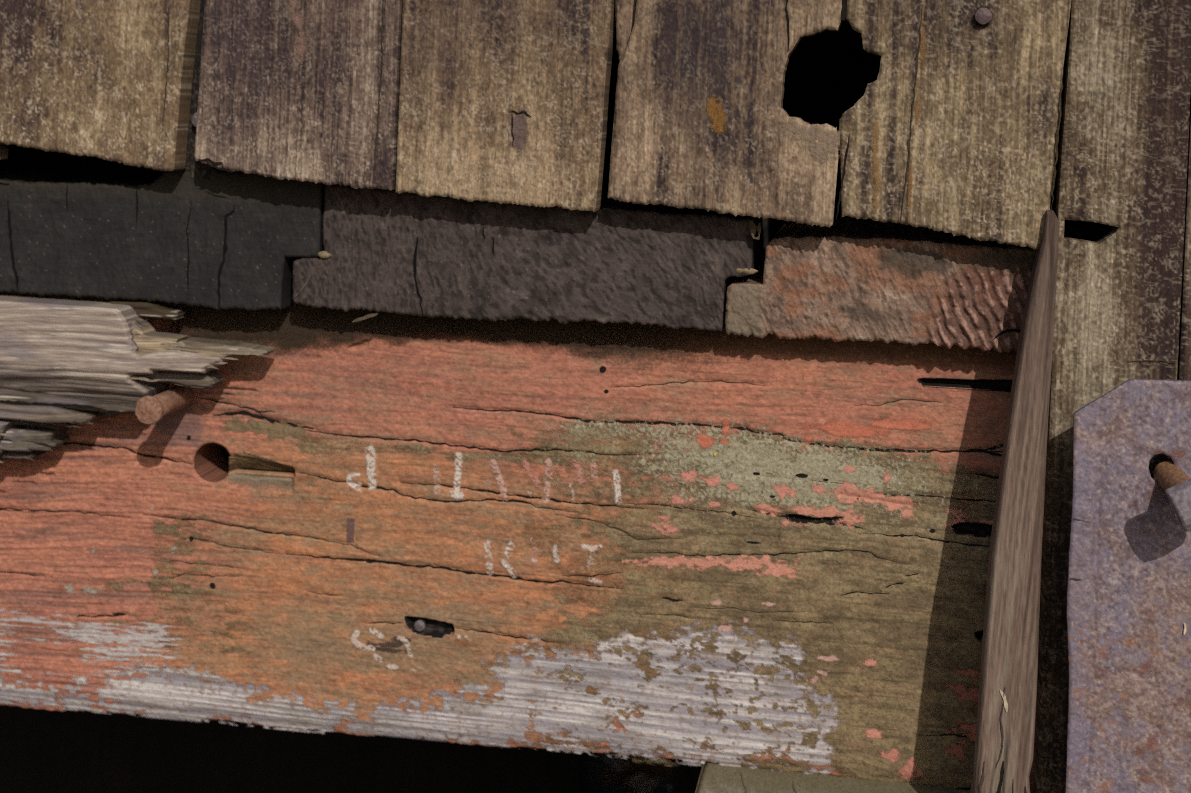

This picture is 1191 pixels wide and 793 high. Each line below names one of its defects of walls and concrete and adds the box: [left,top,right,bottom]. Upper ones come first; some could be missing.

crack [0,182,19,292]
crack [217,205,235,310]
crack [197,397,689,457]
peeling [696,420,731,448]
crack [453,407,1003,502]
crack [0,472,990,596]
peeling [651,470,739,535]
peeling [622,554,813,579]
peeling [753,466,915,529]
crack [640,597,831,624]
peeling [0,609,840,775]
peeling [866,729,923,783]